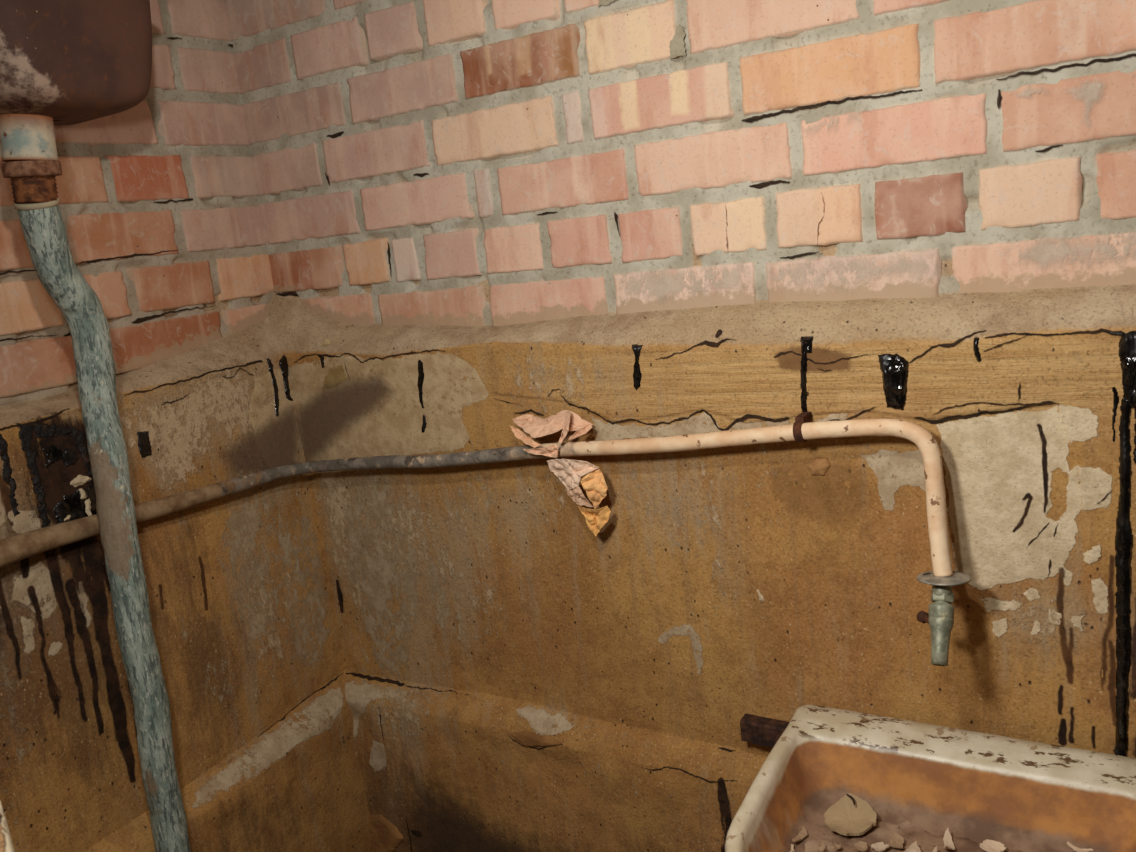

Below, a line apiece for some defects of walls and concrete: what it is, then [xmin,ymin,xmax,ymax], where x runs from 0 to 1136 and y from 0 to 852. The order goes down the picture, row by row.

crack [655,329,734,360]
crack [909,328,1122,363]
crack [124,360,263,405]
peeling [248,351,489,462]
crack [494,388,789,431]
crack [914,383,1059,424]
peeling [860,449,926,511]
peeling [0,492,41,534]
peeling [937,404,1112,637]
peeling [12,562,57,654]
peeling [76,581,92,627]
damp [717,777,731,852]